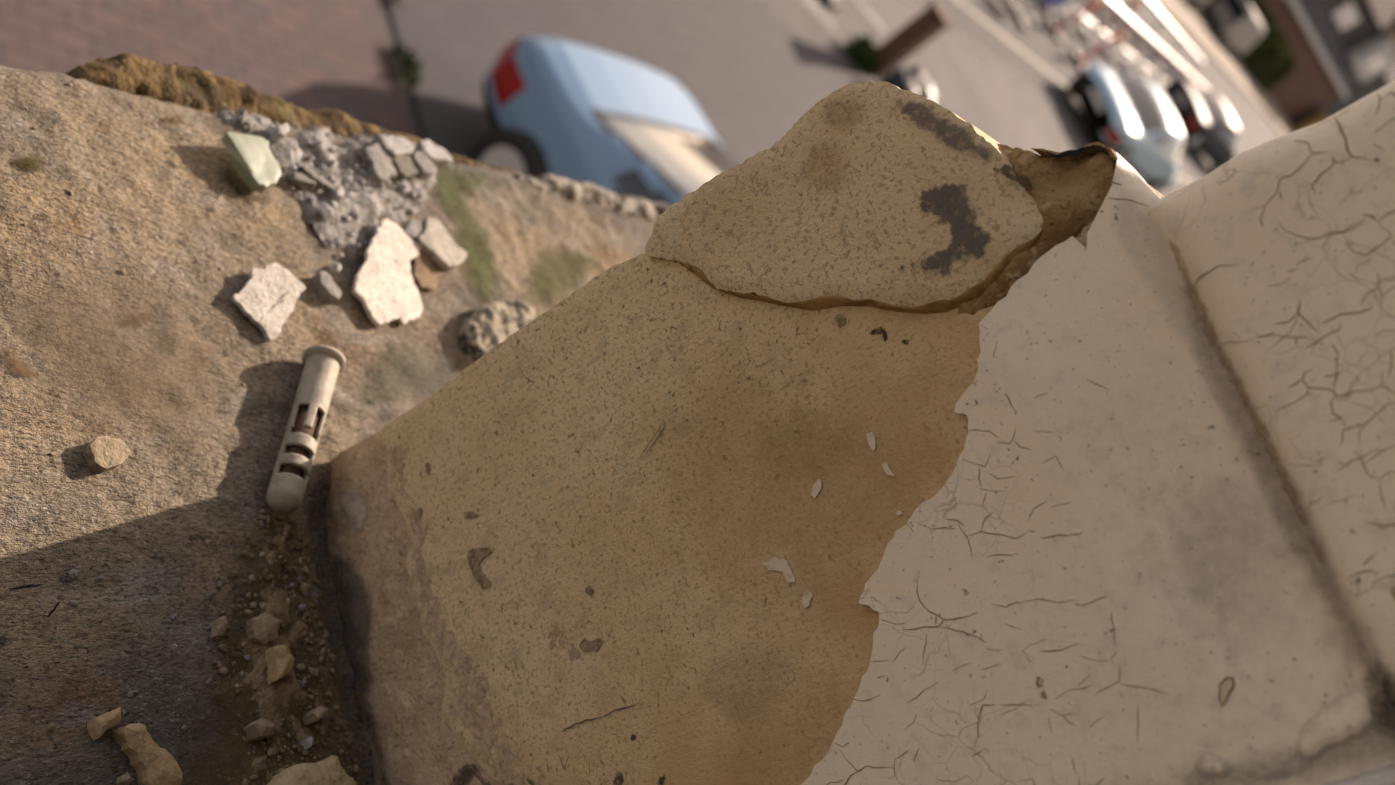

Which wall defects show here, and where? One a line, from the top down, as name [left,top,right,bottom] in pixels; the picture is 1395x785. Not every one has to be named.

peeling [231,217,468,343]
spalling [60,53,670,222]
crack [1110,181,1149,207]
crack [1194,264,1239,286]
crack [1223,92,1395,595]
spalling [82,436,132,474]
peeling [326,142,1134,785]
crack [906,325,1082,561]
damp [333,558,378,750]
crack [827,575,1165,785]